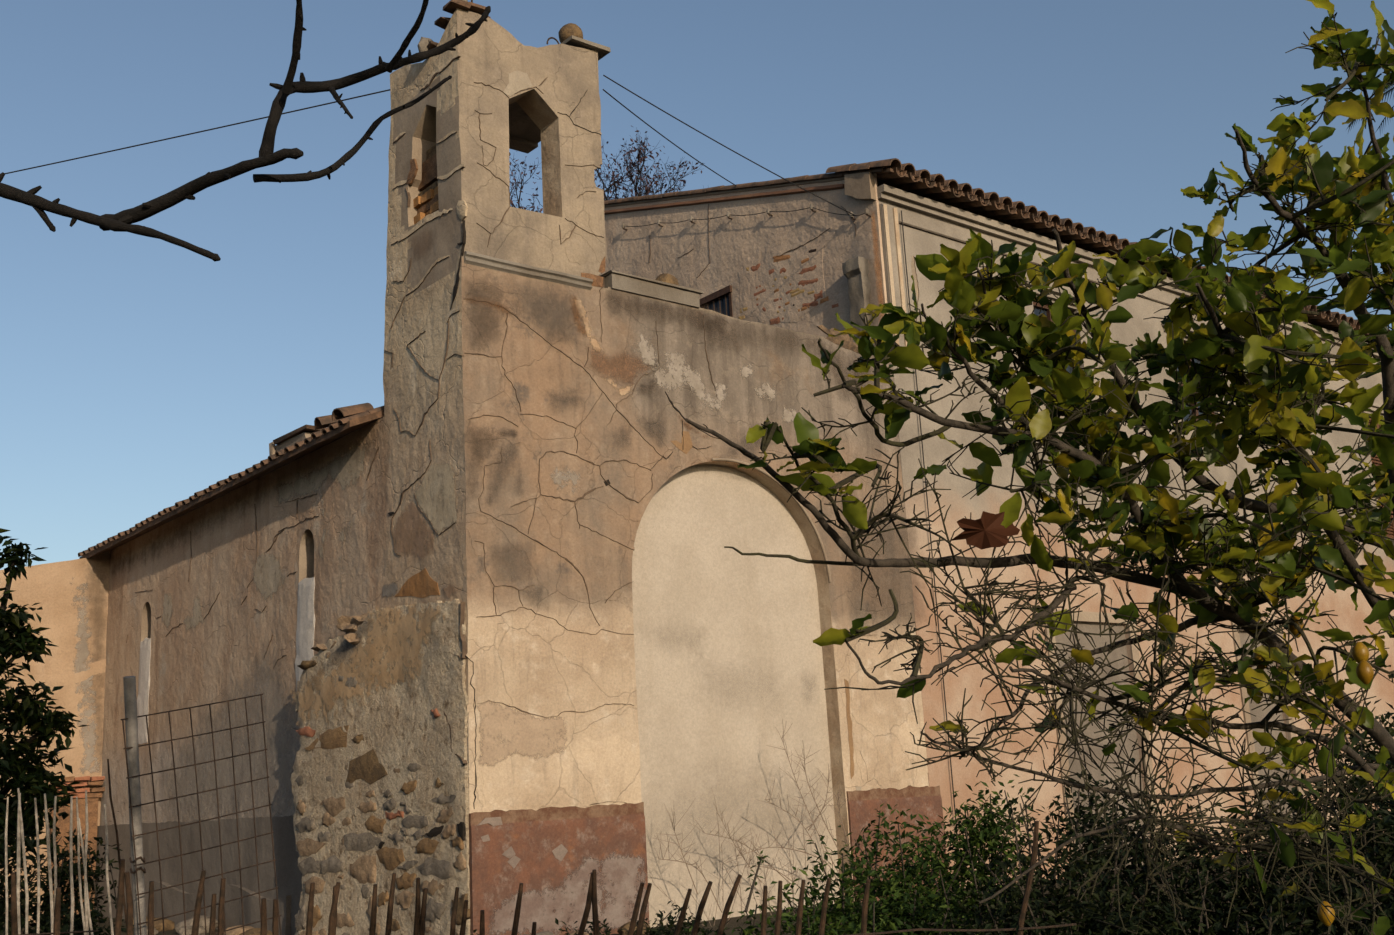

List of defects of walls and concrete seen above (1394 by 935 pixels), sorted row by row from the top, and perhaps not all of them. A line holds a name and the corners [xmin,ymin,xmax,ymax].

crack [775,206,856,258]
spalling [738,244,859,354]
crack [367,53,719,809]
peeling [415,462,457,535]
crack [135,493,319,669]
spalling [291,568,566,935]
peeling [489,844,648,935]